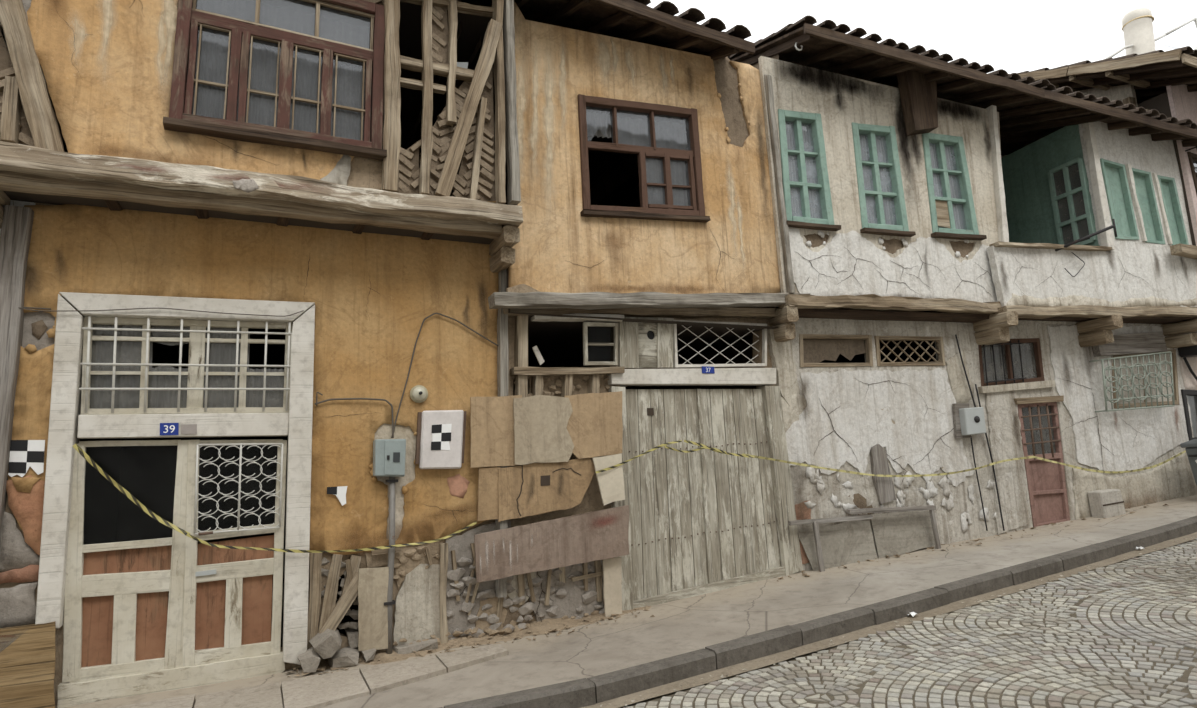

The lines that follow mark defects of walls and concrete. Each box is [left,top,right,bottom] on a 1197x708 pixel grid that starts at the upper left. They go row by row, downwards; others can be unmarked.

spalling [713,57,750,147]
water stain [789,62,864,107]
spalling [804,231,829,248]
spalling [878,237,908,254]
spalling [949,240,974,258]
crack [798,250,1063,296]
spalling [22,311,56,353]
crack [814,378,954,485]
peeling [0,475,45,629]
spalling [475,595,529,635]